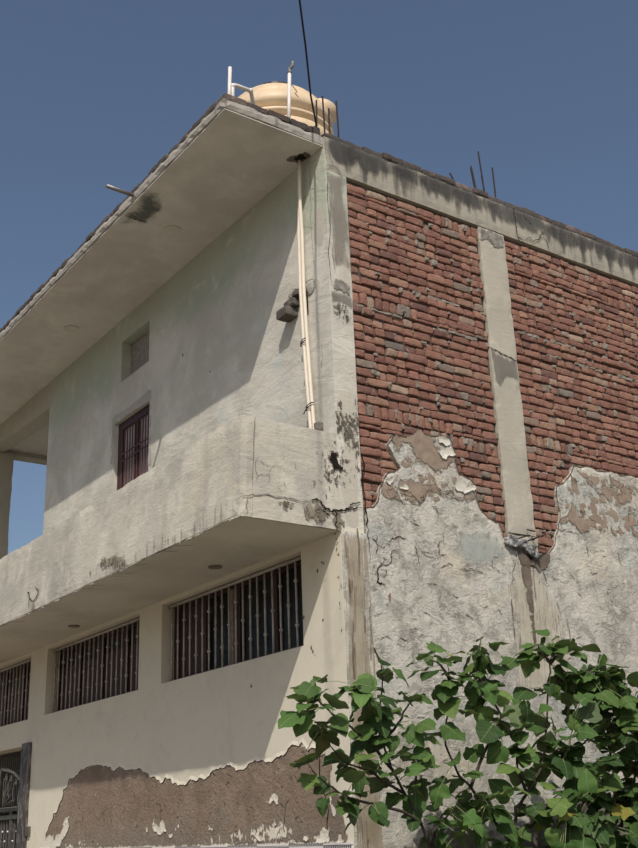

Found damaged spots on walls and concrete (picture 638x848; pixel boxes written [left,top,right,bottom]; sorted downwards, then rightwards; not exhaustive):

water stain [329,137,638,273]
spalling [330,452,343,471]
crack [241,455,493,585]
peeling [366,429,504,538]
peeling [530,465,638,568]
peeling [40,738,348,848]